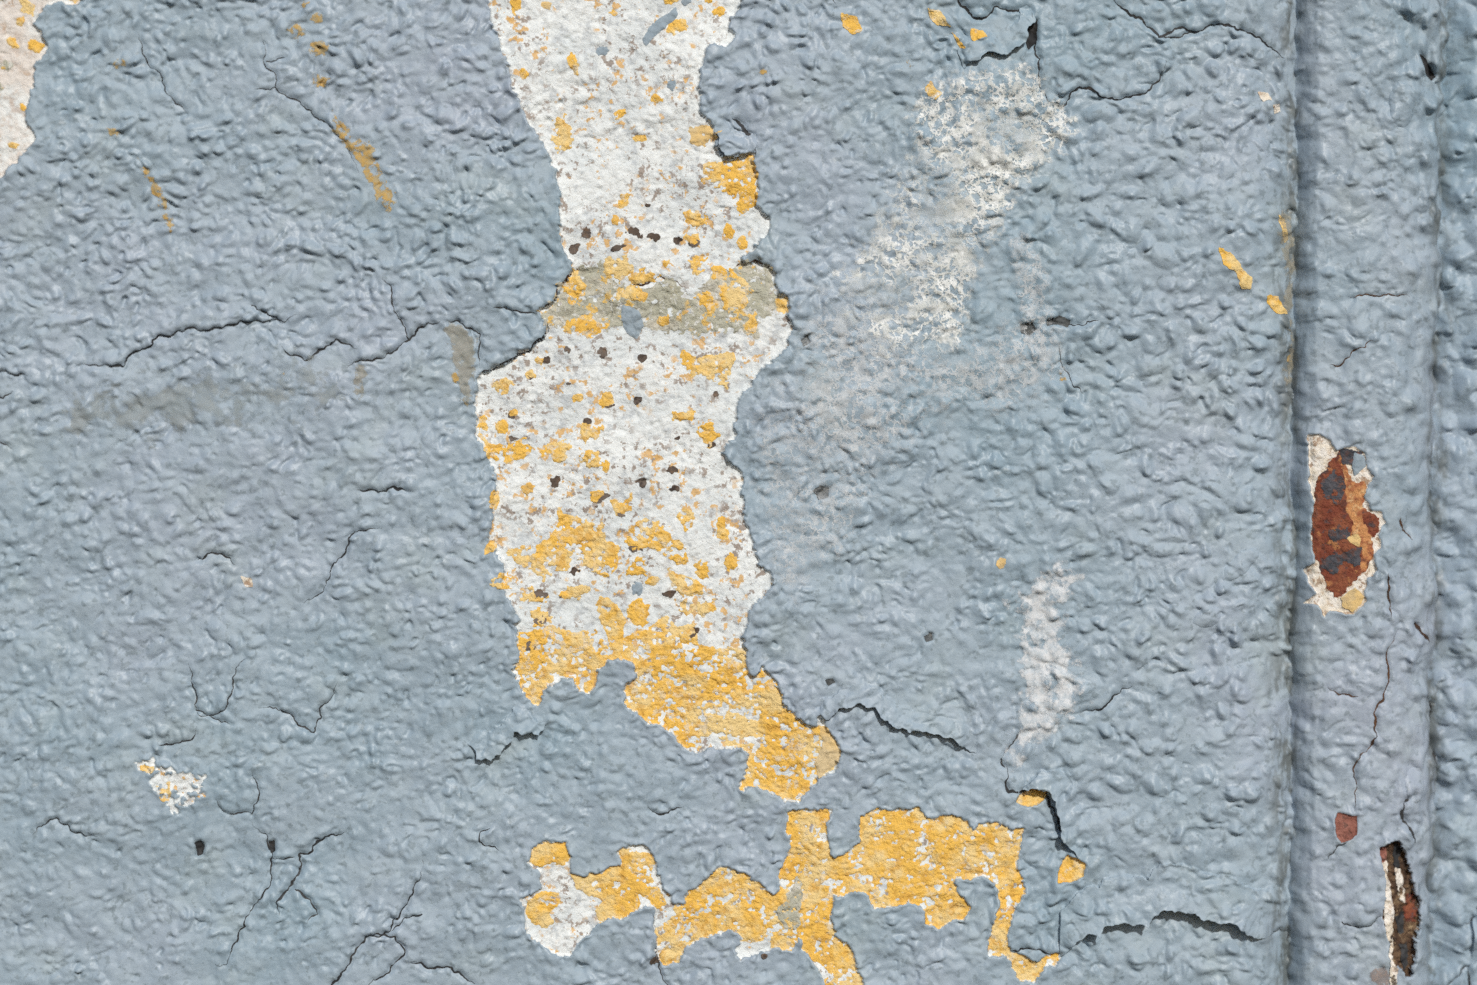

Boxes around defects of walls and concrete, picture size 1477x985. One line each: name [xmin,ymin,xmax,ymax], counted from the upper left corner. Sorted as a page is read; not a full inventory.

peeling [0,0,81,178]
crack [958,0,1019,20]
crack [1034,0,1285,108]
crack [78,269,578,375]
peeling [464,0,1268,985]
rust [1304,434,1386,617]
crack [1328,574,1430,806]
peeling [134,757,207,815]
crack [214,775,344,966]
crack [331,860,475,985]
rust [1380,841,1421,985]
crack [1400,798,1416,842]